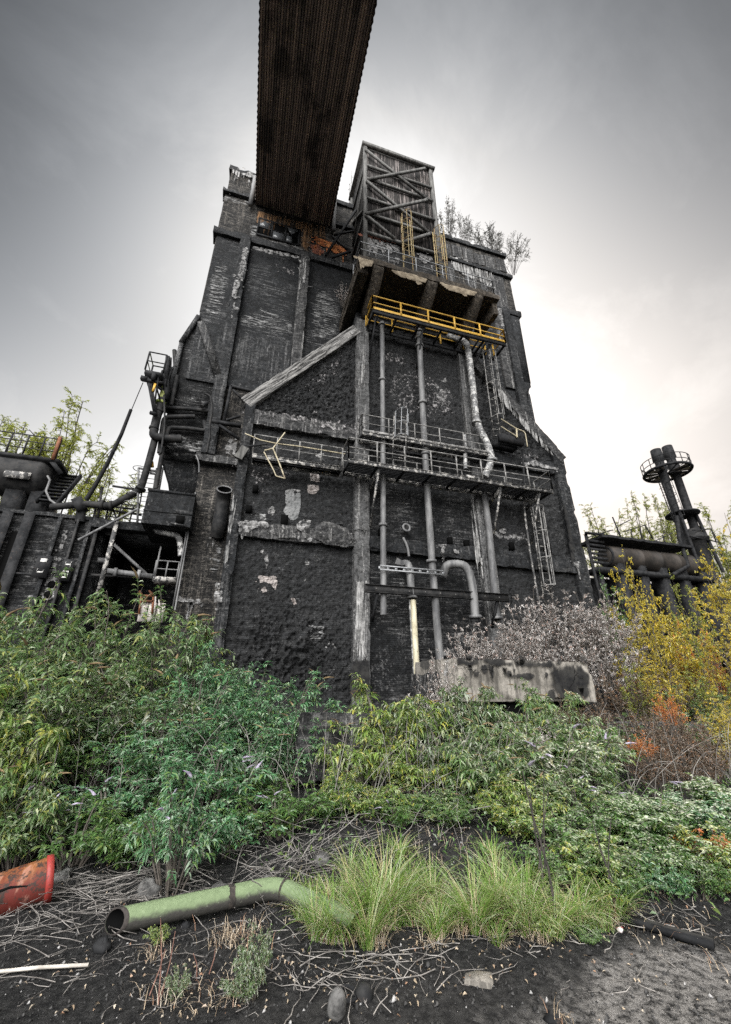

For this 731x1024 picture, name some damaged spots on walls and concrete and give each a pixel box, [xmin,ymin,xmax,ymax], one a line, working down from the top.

rust [257,211,346,262]
peeling [307,473,320,494]
peeling [255,550,278,593]
leakage [457,655,591,715]